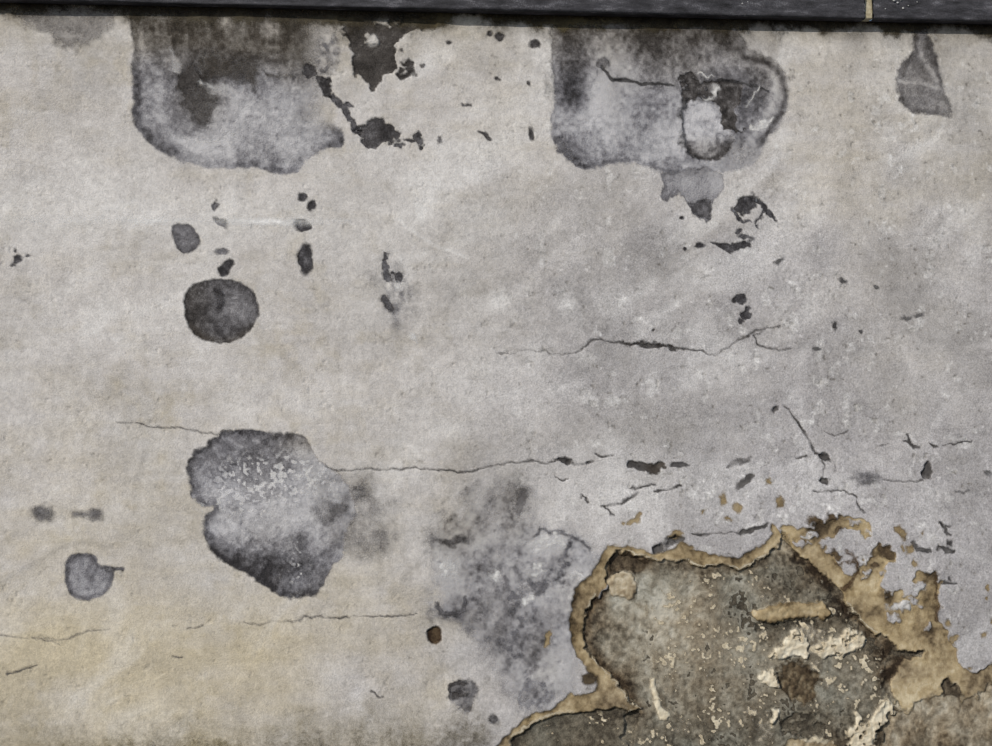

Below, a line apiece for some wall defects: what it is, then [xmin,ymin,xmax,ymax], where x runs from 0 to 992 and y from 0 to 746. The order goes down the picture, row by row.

spalling [498,514,992,746]